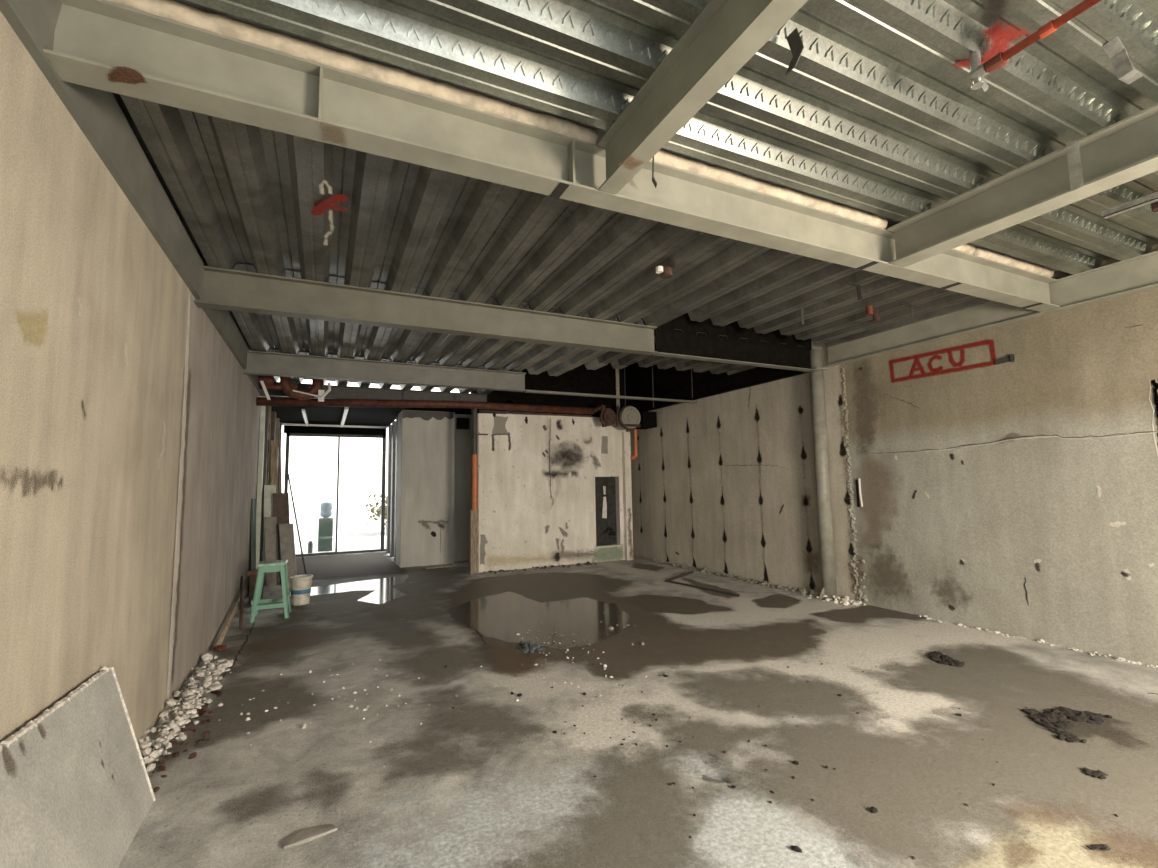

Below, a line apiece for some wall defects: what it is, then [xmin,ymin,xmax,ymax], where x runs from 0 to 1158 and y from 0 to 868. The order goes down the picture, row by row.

rust [105,66,146,85]
crack [878,431,1158,455]